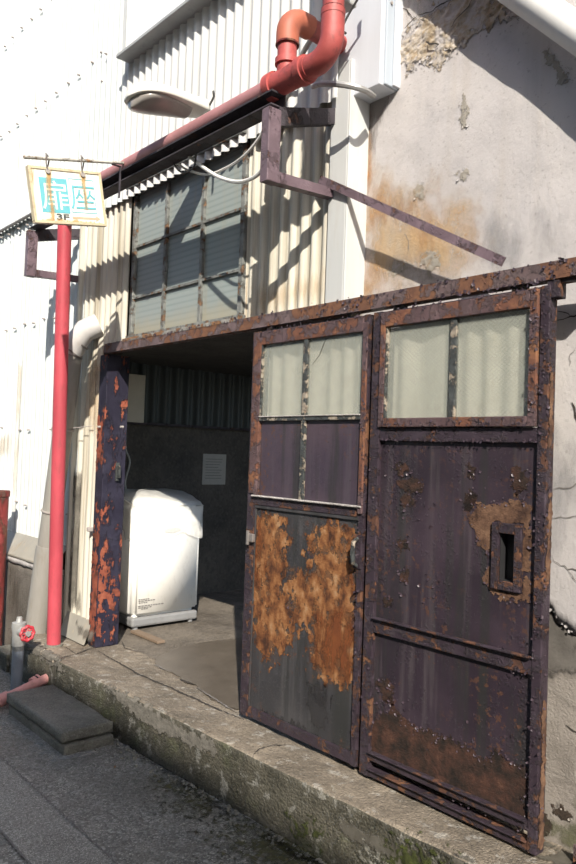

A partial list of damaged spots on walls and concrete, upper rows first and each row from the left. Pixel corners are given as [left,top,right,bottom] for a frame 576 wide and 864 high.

spalling [400,0,520,78]
rust [96,415,104,468]
peeling [107,250,576,490]
rust [89,501,120,644]
rust [253,509,356,692]
rust [463,462,534,605]
flaking render [459,451,576,679]
spalling [103,684,217,758]
damp [338,796,423,864]
peeling [351,666,574,837]
rust [538,700,547,850]
damp [536,841,573,864]